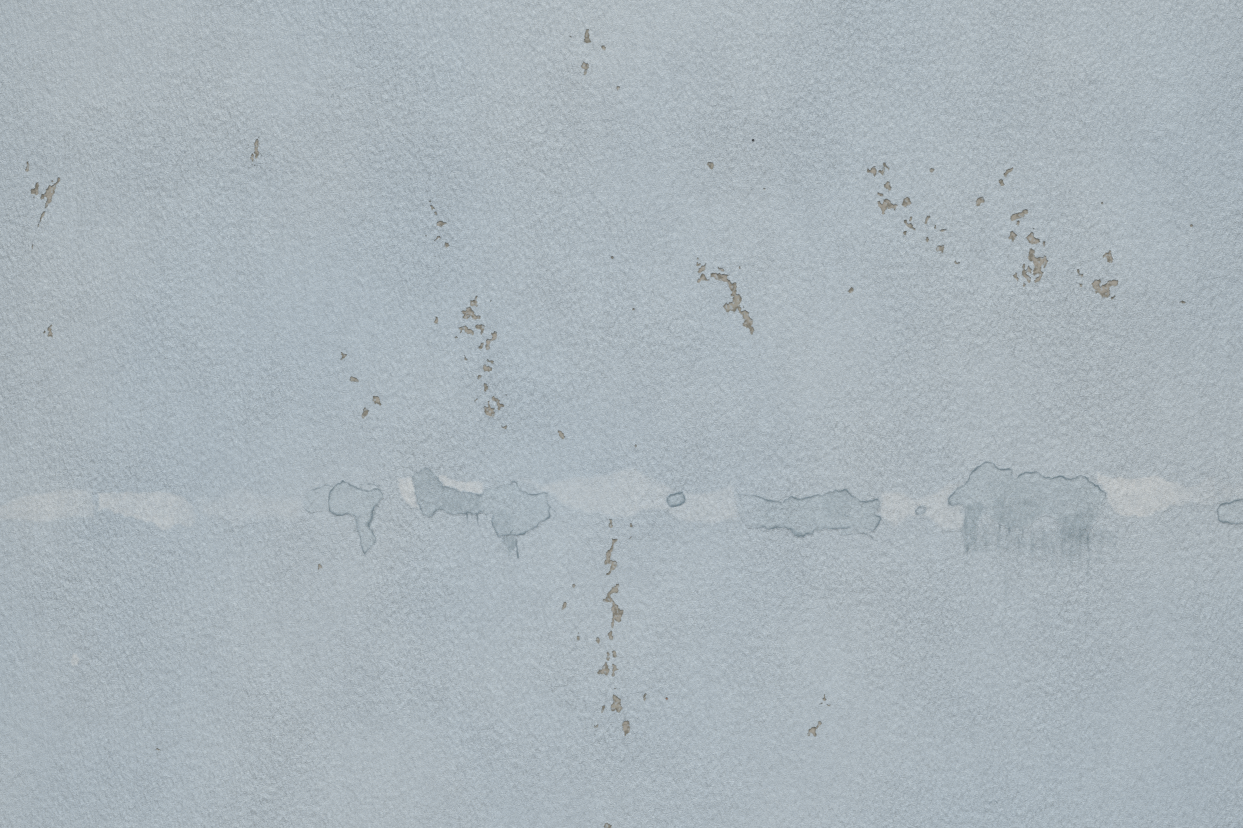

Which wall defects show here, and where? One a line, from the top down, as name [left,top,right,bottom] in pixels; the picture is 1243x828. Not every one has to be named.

peeling [25,162,60,227]
peeling [696,258,754,335]
peeling [867,163,960,264]
peeling [1008,209,1048,287]
peeling [1077,269,1118,300]
peeling [455,296,508,429]
damp [302,479,385,555]
damp [412,467,551,558]
damp [737,488,883,538]
damp [947,461,1108,534]
peeling [594,519,633,736]